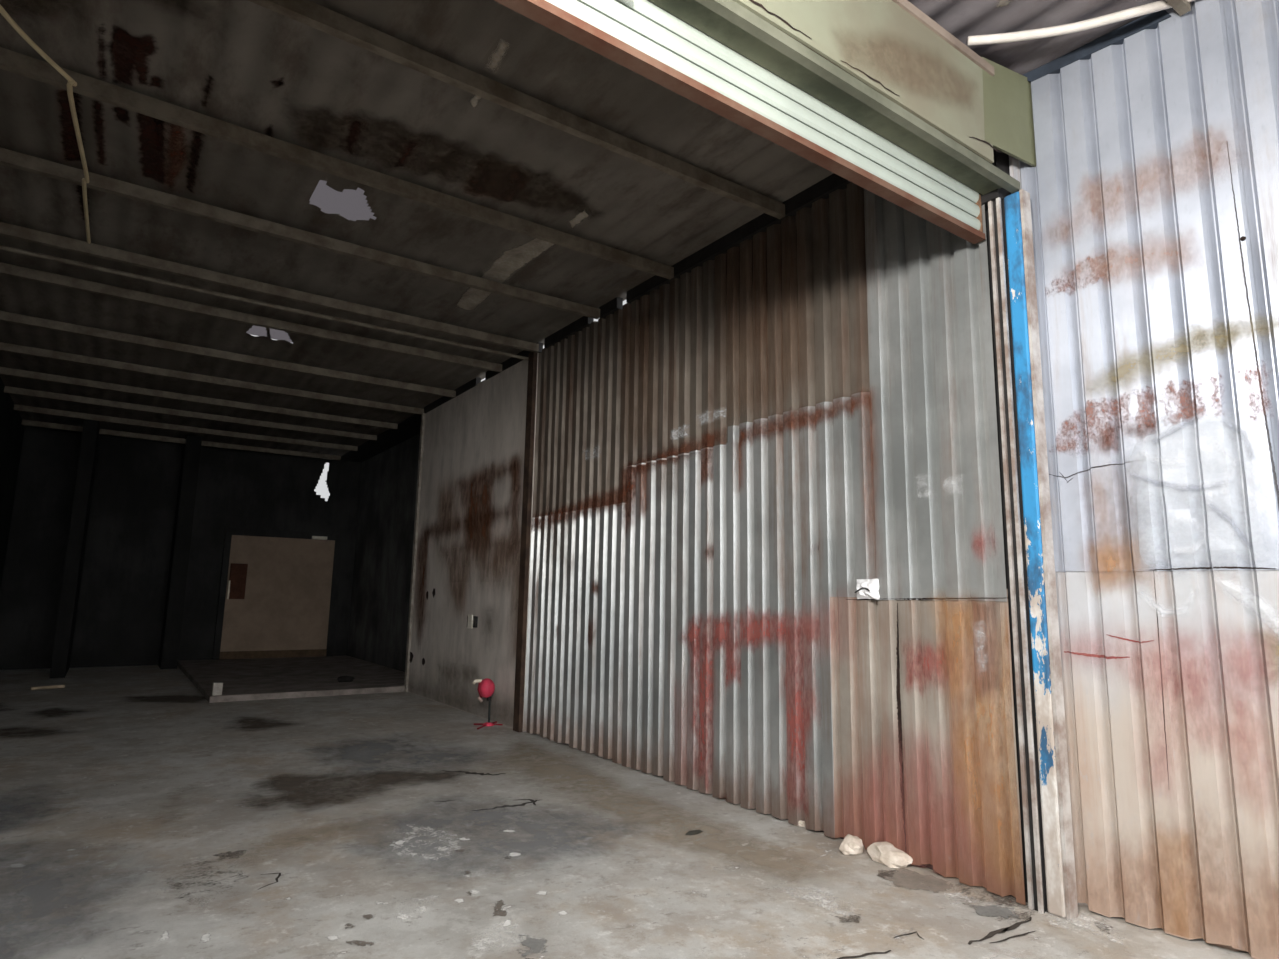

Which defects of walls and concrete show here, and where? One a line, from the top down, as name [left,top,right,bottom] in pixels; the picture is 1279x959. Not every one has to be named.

corrosion [98,26,162,88]
corrosion [57,90,203,192]
corrosion [1052,248,1180,291]
corrosion [739,398,871,485]
corrosion [418,433,719,632]
leakage [252,740,467,808]
spalling [326,901,388,946]
spalling [471,900,547,959]